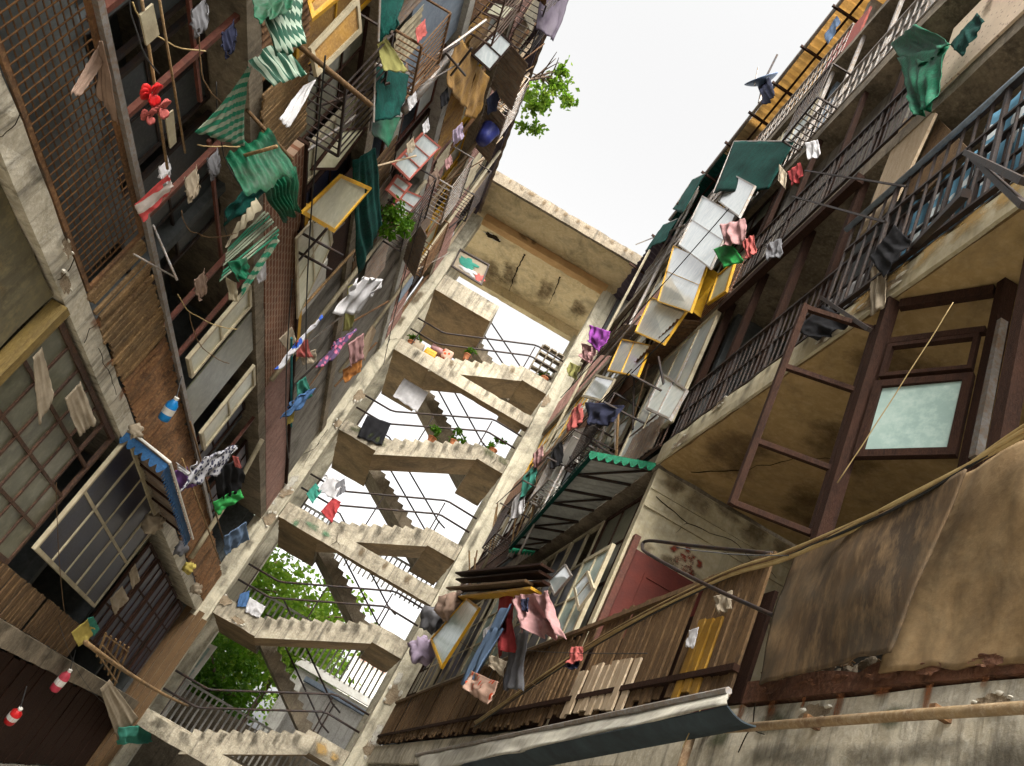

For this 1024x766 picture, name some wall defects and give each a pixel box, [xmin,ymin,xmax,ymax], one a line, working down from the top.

crack [692,459,792,473]
crack [656,496,751,560]
rust [917,662,941,708]
rust [967,653,1004,685]